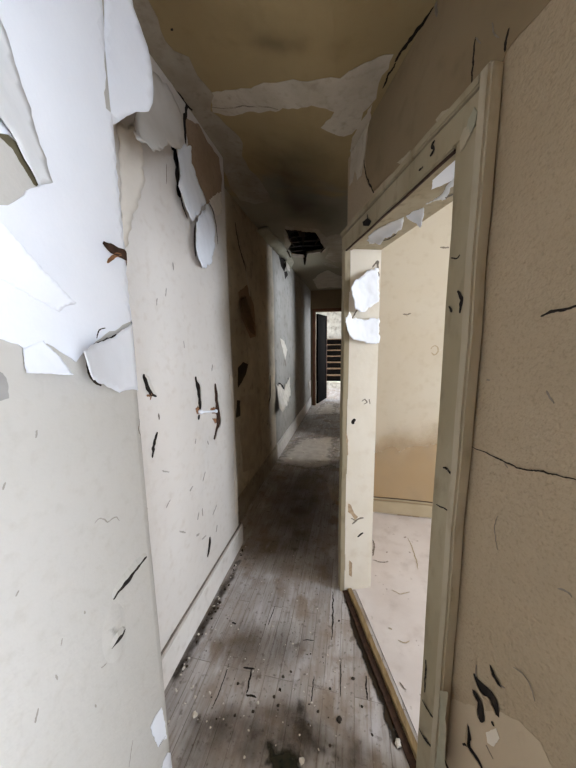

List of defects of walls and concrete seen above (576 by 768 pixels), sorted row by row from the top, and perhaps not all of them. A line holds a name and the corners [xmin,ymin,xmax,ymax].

crack [383,1,438,88]
peeling [0,0,551,393]
peeling [0,372,9,401]
crack [138,374,160,458]
peeling [236,362,291,472]
crack [472,447,576,481]
crack [462,723,483,768]
peeling [435,665,552,768]
crack [489,665,505,688]